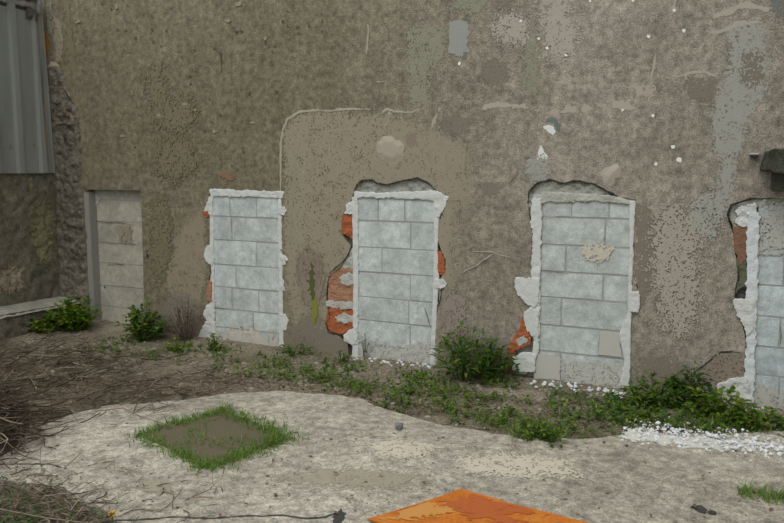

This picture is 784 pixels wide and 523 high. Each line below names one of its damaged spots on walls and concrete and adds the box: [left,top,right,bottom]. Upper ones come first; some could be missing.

flaking render [341,214,353,239]
flaking render [436,251,446,275]
flaking render [732,226,748,264]
flaking render [326,268,354,335]
flaking render [504,317,532,375]
crack [691,351,740,376]